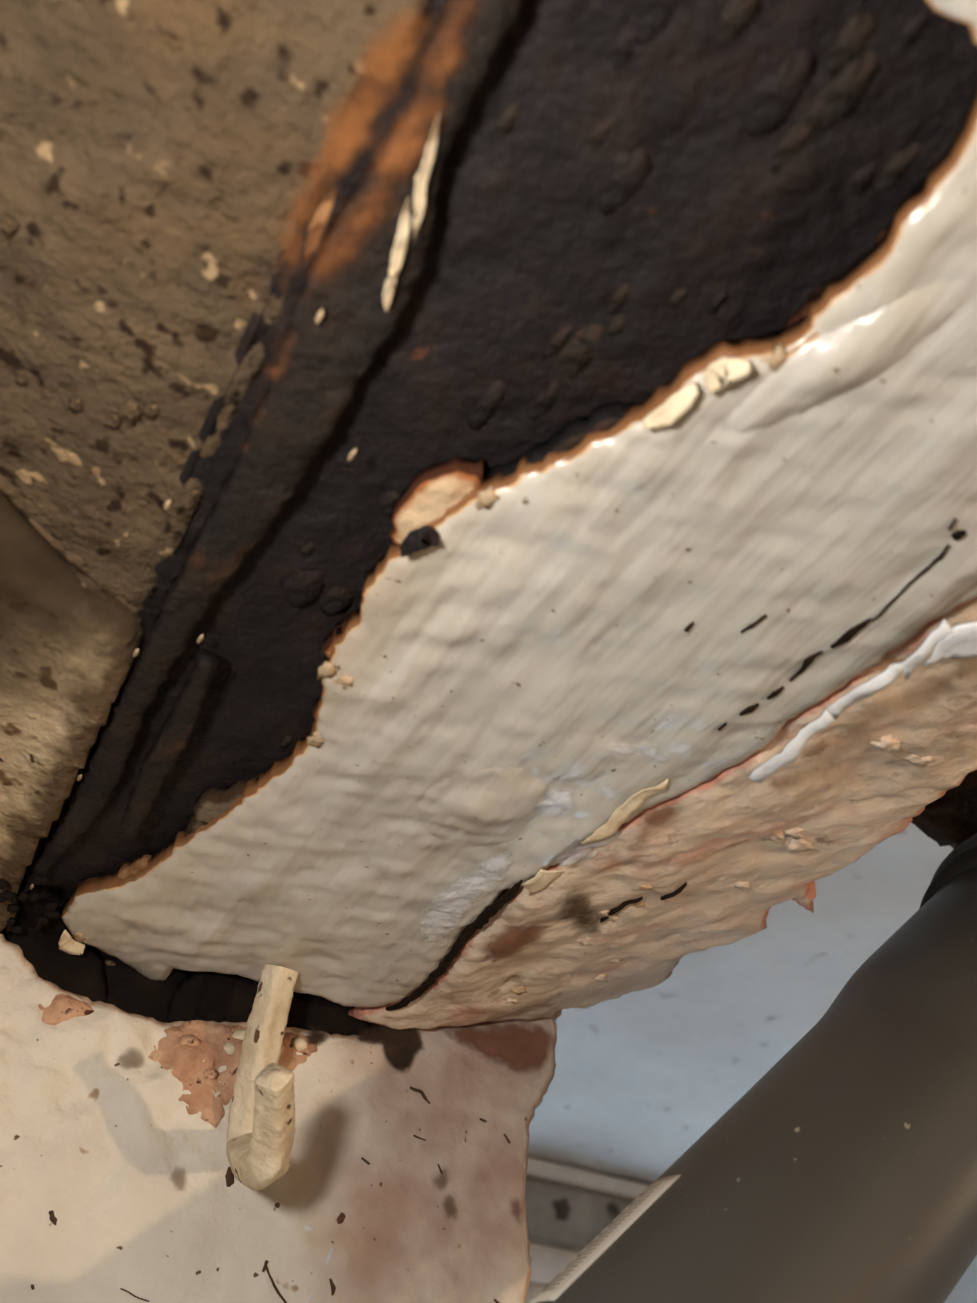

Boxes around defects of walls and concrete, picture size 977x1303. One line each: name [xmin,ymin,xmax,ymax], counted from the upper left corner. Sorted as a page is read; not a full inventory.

corrosion [319,19,413,174]
corrosion [317,101,438,273]
peeling [383,113,440,313]
spalling [0,0,430,614]
peeling [642,357,751,430]
peeling [400,525,440,558]
crack [718,518,966,731]
spalling [348,597,977,1030]
spalling [38,994,94,1025]
peeling [58,929,85,955]
spalling [148,1020,247,1128]
spalling [278,1032,317,1070]